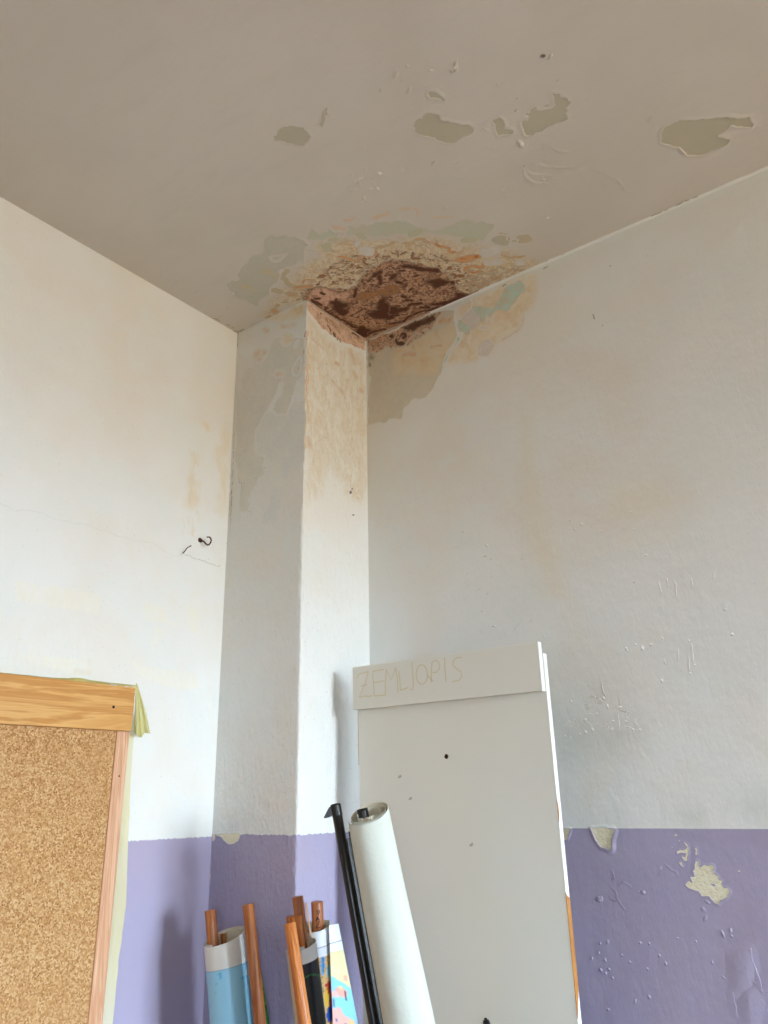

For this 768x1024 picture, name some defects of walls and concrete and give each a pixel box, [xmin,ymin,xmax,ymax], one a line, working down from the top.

peeling [270,122,315,149]
peeling [408,89,576,146]
peeling [656,112,757,159]
leakage [252,206,545,510]
peeling [366,280,526,427]
peeling [588,824,619,855]
peeling [673,833,732,908]